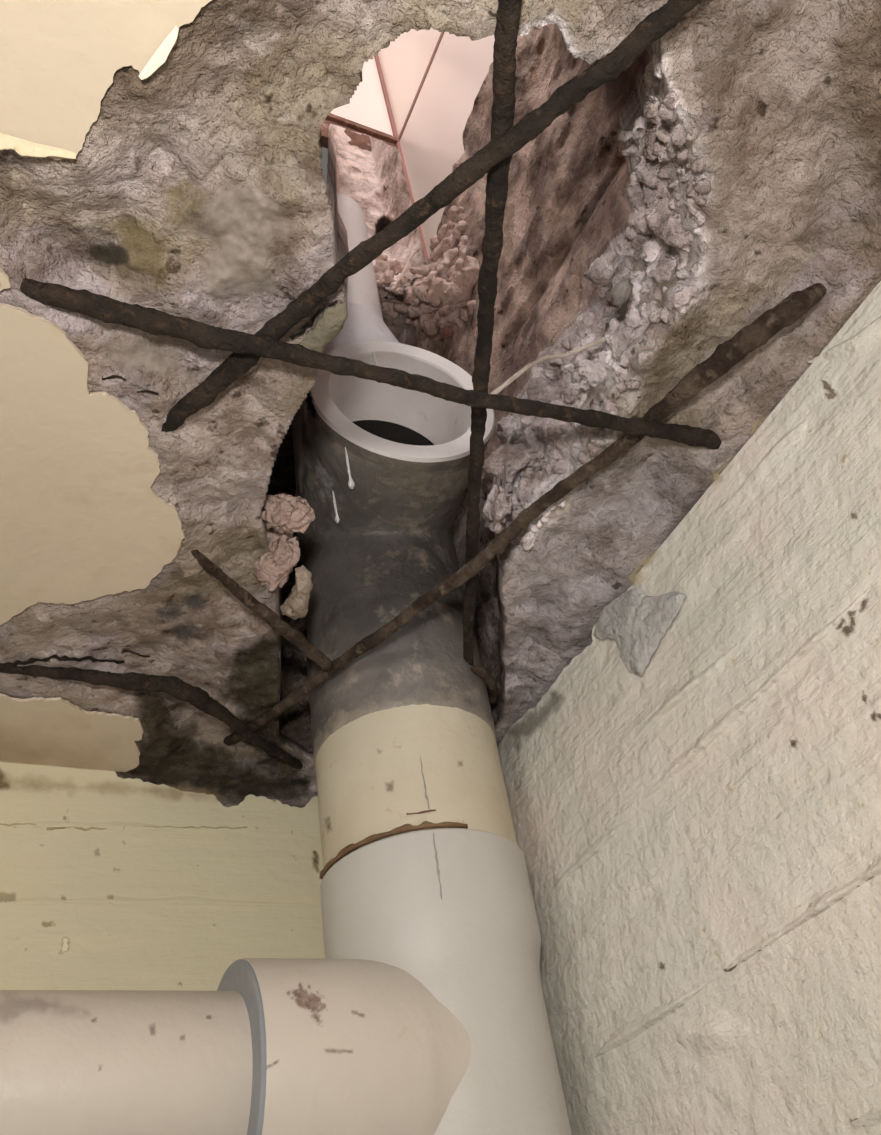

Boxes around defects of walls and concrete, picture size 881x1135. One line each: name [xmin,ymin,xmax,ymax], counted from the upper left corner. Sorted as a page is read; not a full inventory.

crack [0,650,150,669]
spalling [0,0,881,808]